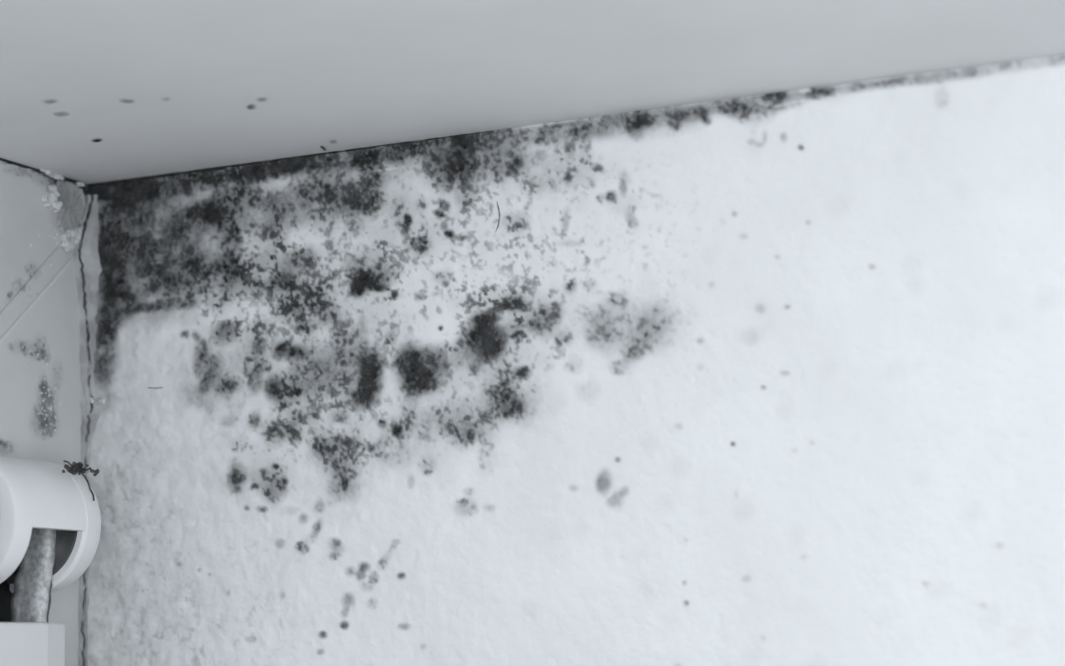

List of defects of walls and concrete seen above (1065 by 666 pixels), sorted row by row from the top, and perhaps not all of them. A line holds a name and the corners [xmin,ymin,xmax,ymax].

leakage [626,114,653,129]
leakage [725,102,747,116]
leakage [806,88,832,96]
leakage [44,129,512,368]
leakage [470,300,520,360]
leakage [267,382,294,405]
leakage [352,353,382,406]
leakage [397,349,437,394]
leakage [315,442,348,490]